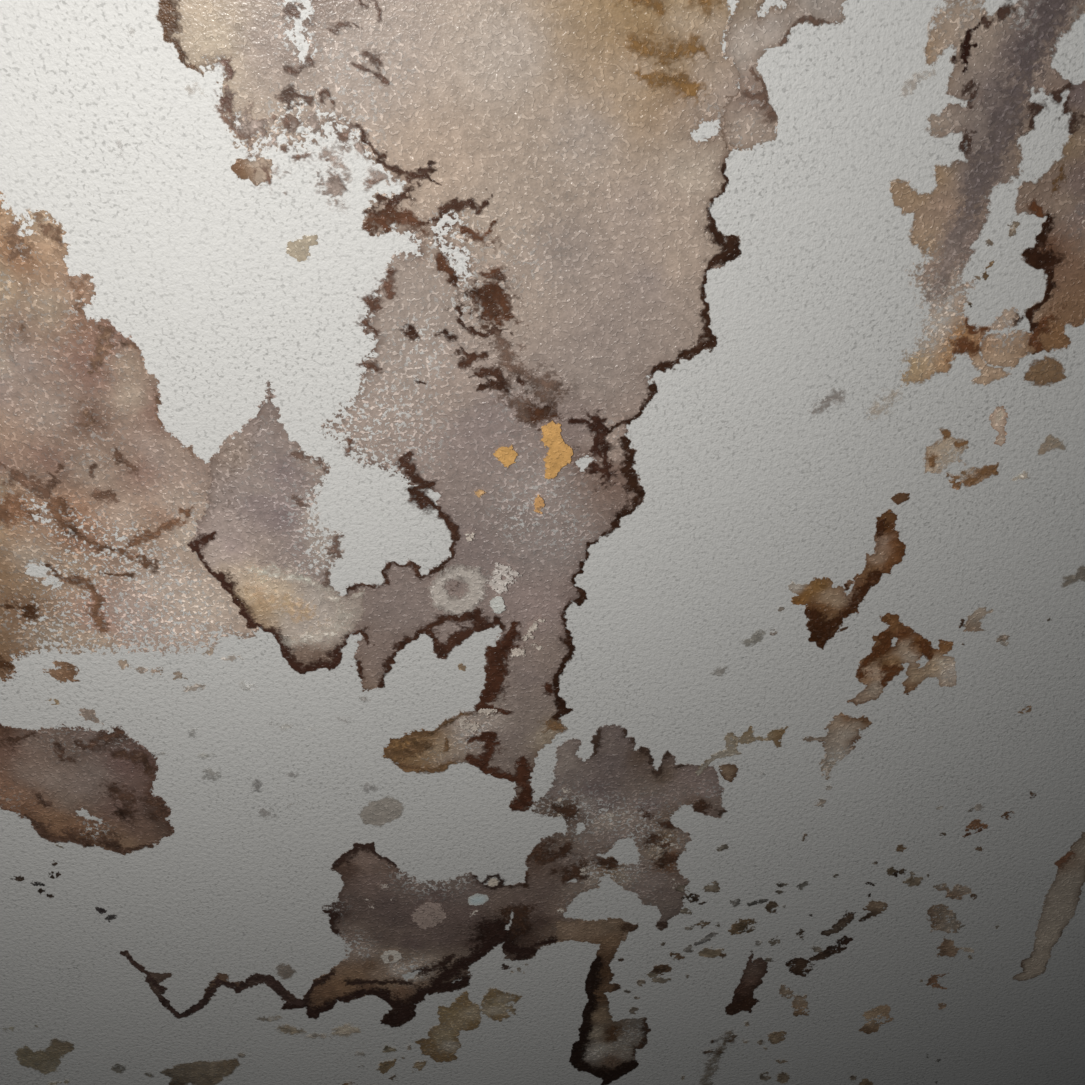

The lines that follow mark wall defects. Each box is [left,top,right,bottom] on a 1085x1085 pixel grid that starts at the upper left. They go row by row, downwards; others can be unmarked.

water stain [890,0,1085,386]
water stain [0,0,846,1085]
water stain [891,492,910,505]
water stain [803,712,873,807]